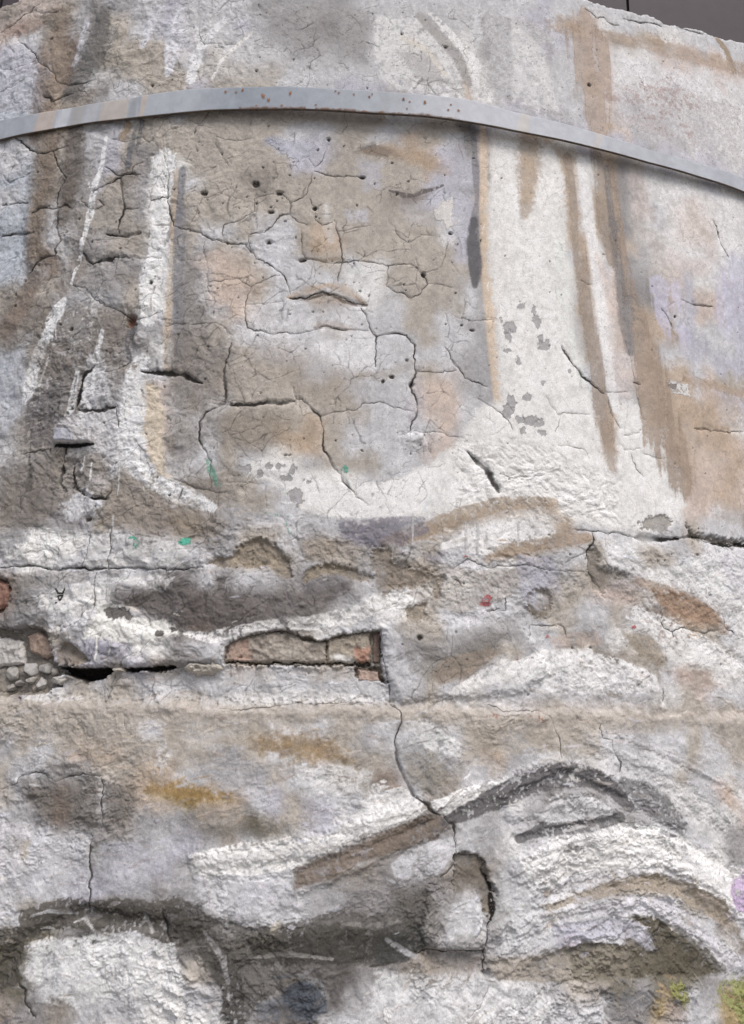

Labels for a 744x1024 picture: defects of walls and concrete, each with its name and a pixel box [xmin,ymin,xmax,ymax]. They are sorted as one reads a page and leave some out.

corrosion [239,91,460,120]
damp [120,119,144,168]
damp [468,217,482,287]
crack [2,138,513,500]
peeling [499,317,521,365]
peeling [517,301,550,350]
peeling [502,393,546,436]
crack [451,436,542,493]
crack [453,530,744,586]
spalling [0,629,89,696]
spalling [184,631,384,682]
crack [410,791,495,1012]